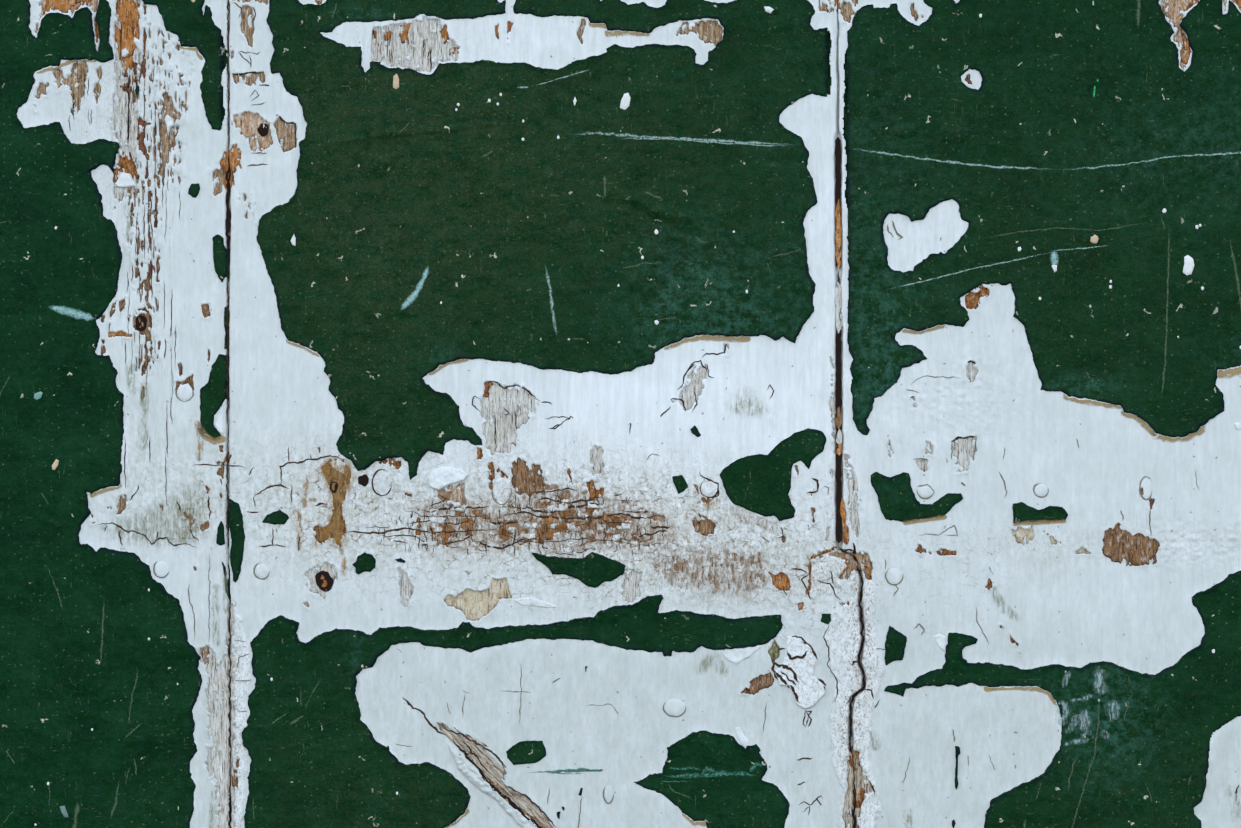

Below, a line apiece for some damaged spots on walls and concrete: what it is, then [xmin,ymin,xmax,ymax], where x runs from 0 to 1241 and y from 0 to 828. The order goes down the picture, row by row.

peeling [29,0,100,51]
peeling [320,0,724,89]
peeling [839,0,932,26]
crack [834,48,842,284]
peeling [883,199,968,272]
crack [472,381,573,451]
crack [660,344,729,417]
crack [914,436,1007,498]
crack [350,488,670,556]
crack [761,329,910,828]
peeling [190,660,225,828]
peeling [1194,716,1241,828]